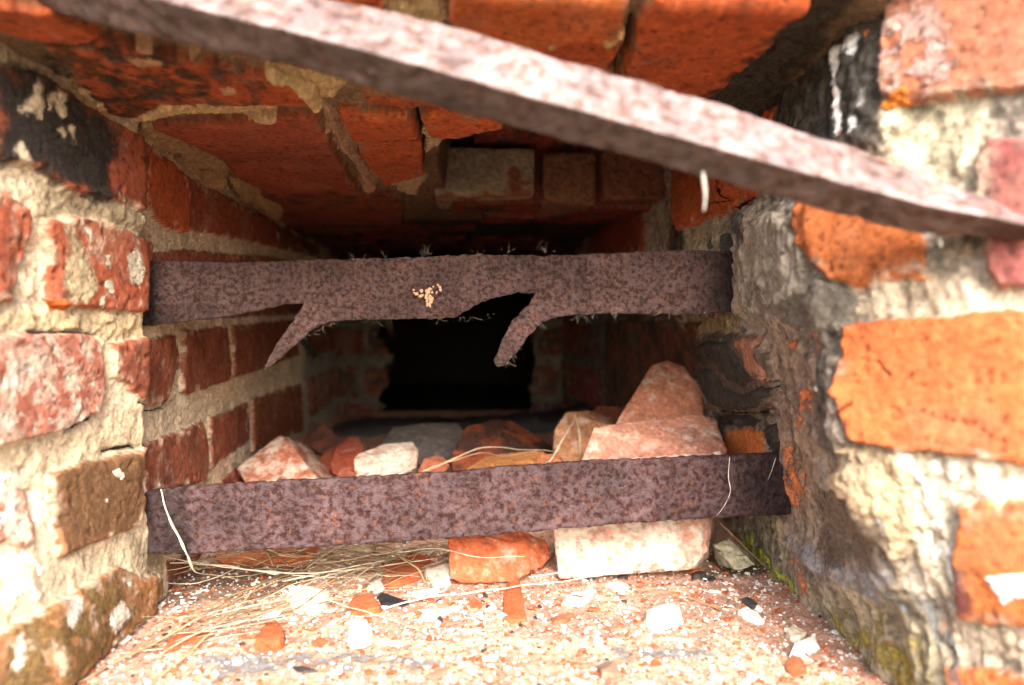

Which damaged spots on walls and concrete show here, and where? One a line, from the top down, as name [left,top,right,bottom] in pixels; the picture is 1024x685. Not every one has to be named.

peeling [18,76,108,139]
leakage [829,45,842,133]
peeling [11,142,32,172]